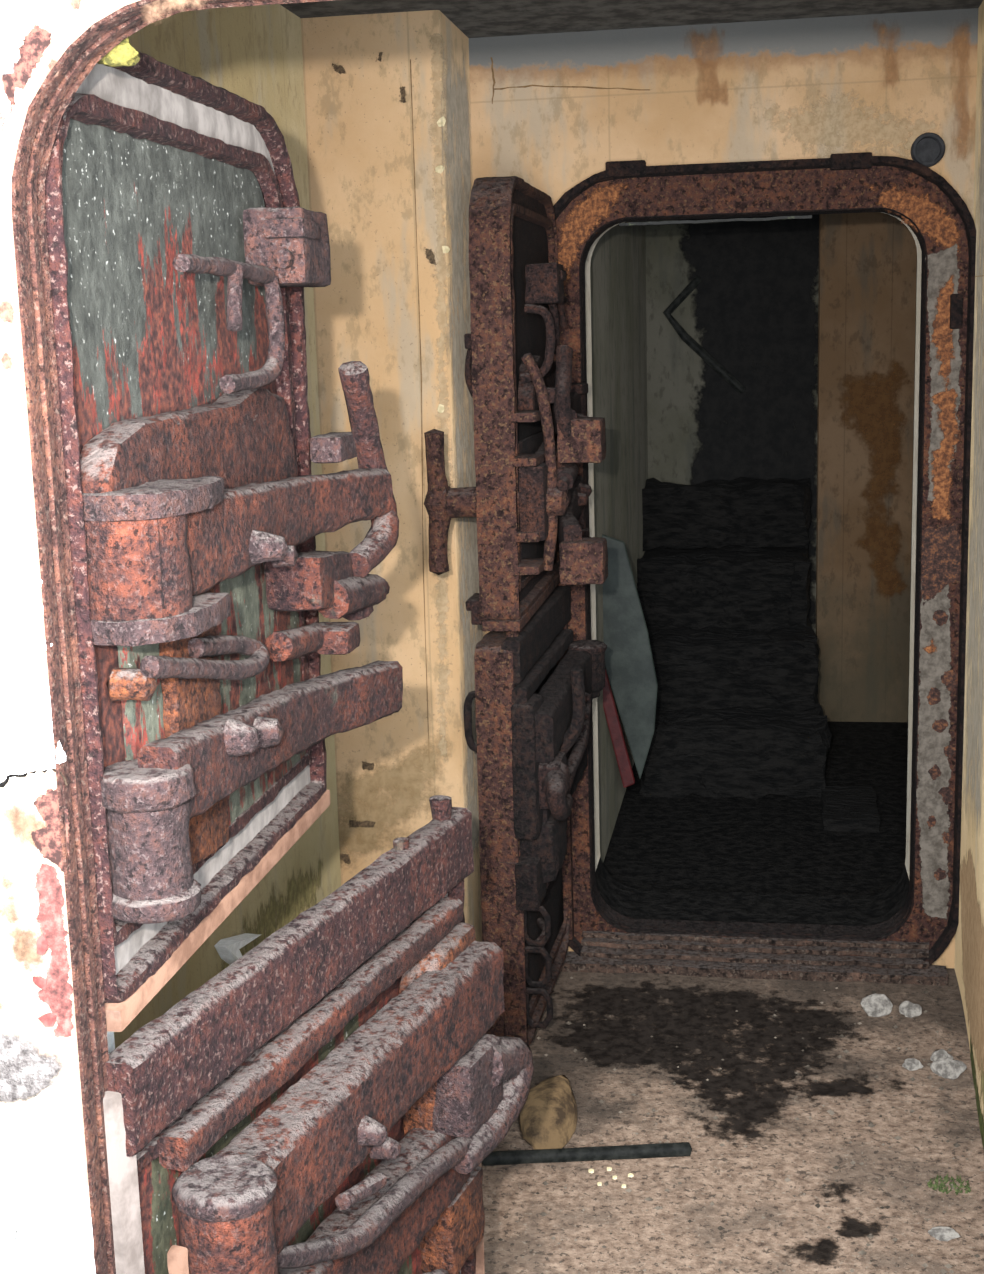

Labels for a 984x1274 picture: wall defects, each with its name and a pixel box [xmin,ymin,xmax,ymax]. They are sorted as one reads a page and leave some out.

corrosion [558,183,628,285]
corrosion [863,183,961,252]
corrosion [841,275,961,626]
corrosion [927,670,957,705]
corrosion [928,719,956,805]
peeling [33,863,74,1038]
damp [547,979,874,1147]
damp [970,1038,984,1148]
damp [784,1217,881,1265]
damp [822,1183,856,1202]